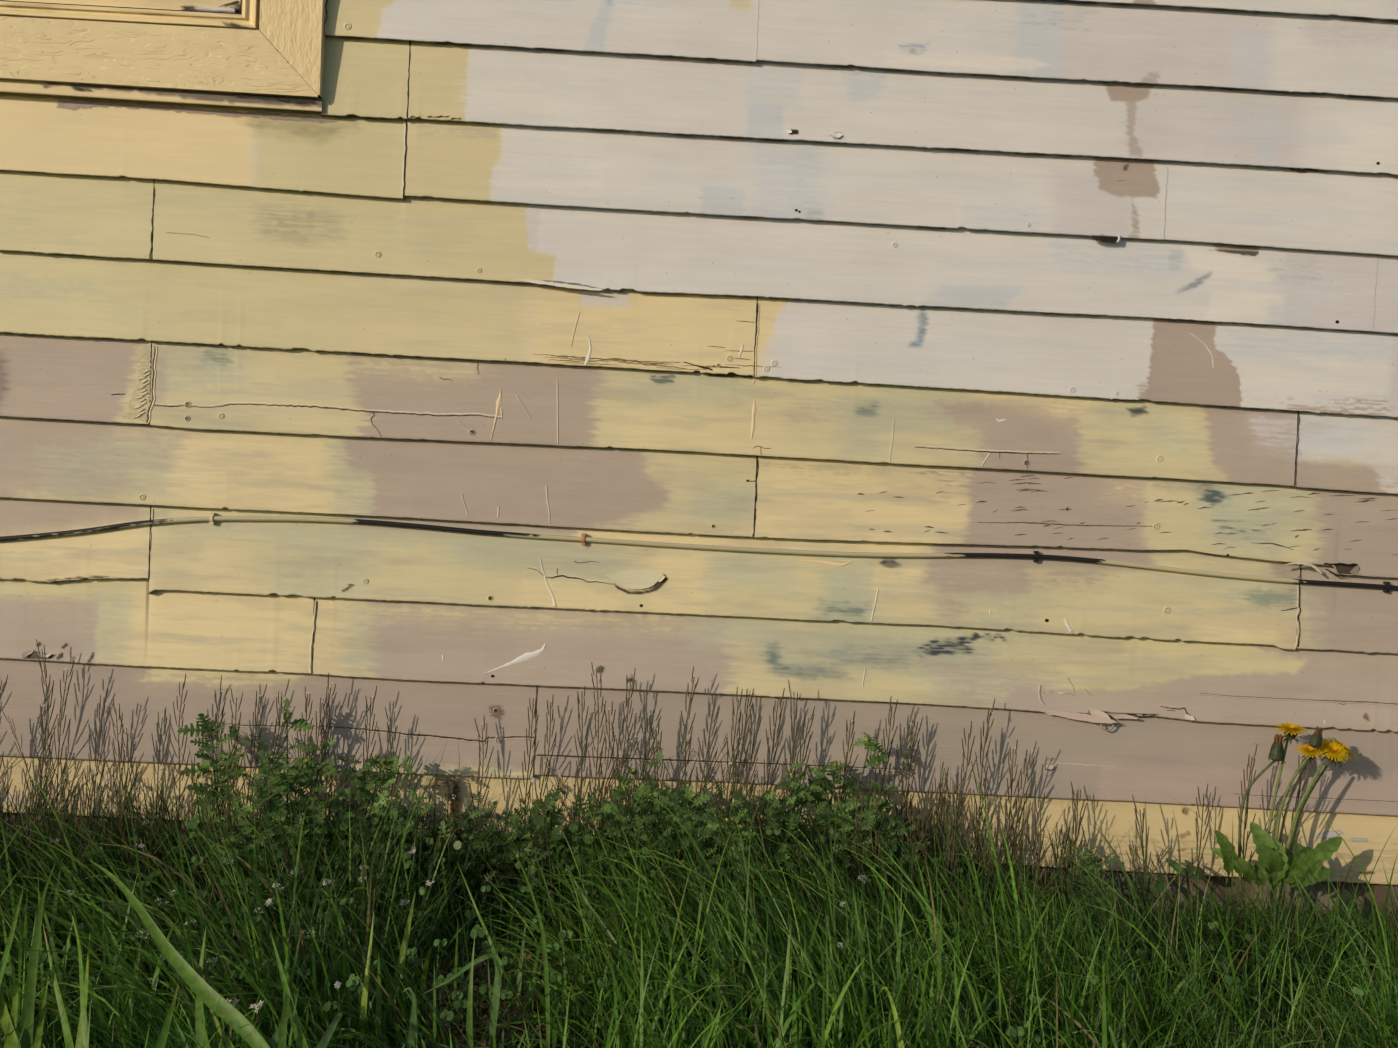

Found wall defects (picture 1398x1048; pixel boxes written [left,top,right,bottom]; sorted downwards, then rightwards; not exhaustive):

peeling [517,279,602,291]
crack [111,346,501,436]
crack [859,414,1398,647]
crack [527,561,614,585]
spalling [22,642,67,659]